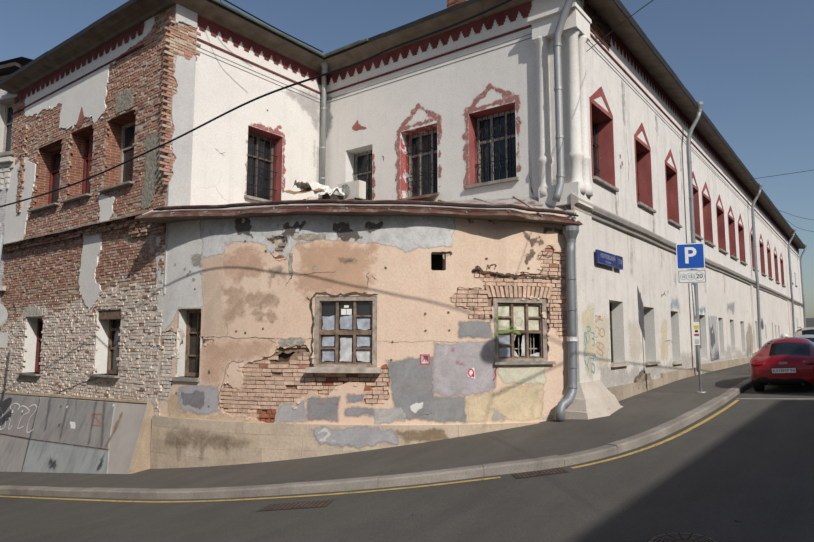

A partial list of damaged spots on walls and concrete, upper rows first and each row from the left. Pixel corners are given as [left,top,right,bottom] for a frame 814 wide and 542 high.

peeling [462,83,521,189]
spalling [0,5,455,423]
crack [278,259,378,364]
spalling [447,225,568,338]